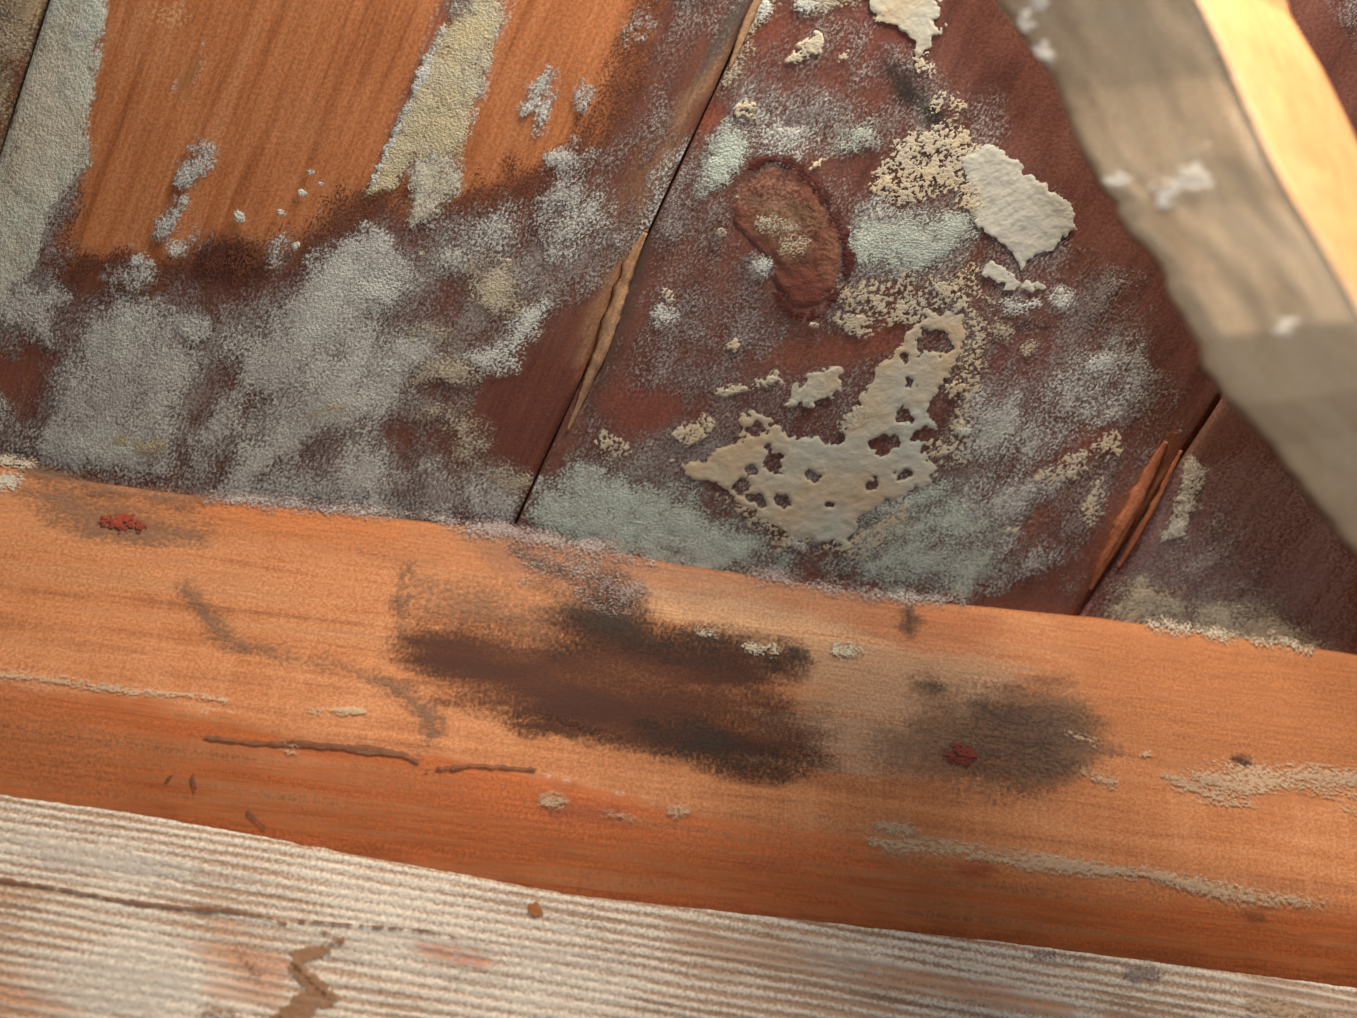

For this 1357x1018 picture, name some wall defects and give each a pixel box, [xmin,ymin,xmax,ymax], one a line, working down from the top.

leakage [0,0,1178,793]
peeling [594,429,632,460]
peeling [670,0,1077,564]
leakage [538,791,568,808]